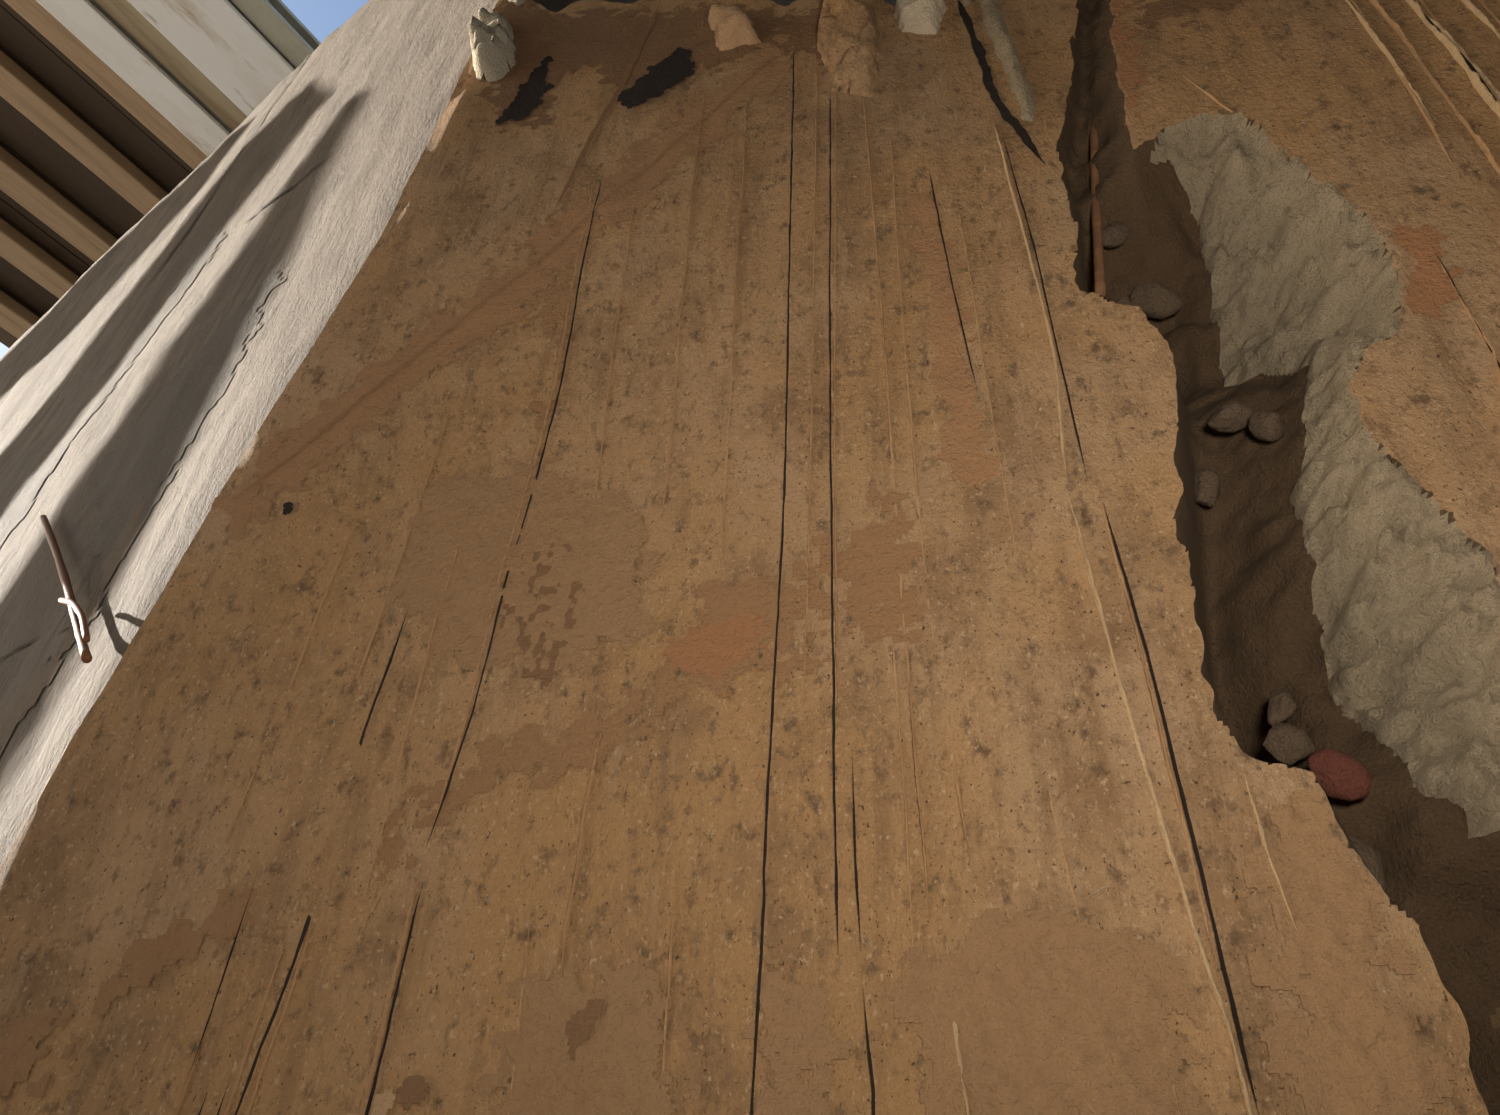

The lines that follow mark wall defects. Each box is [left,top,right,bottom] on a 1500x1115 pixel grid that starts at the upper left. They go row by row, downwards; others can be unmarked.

crack [958,0,1500,1115]
spalling [885,908,1207,1115]
spalling [1237,784,1455,1115]